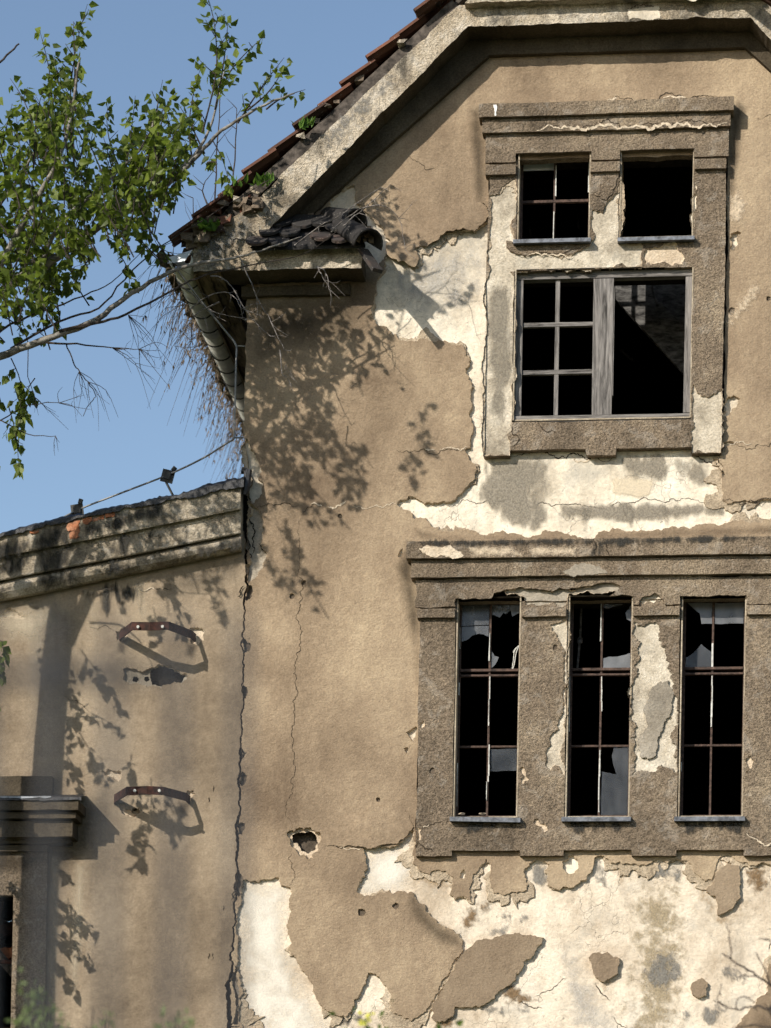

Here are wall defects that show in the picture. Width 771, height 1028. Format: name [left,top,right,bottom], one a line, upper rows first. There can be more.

flaking render [328,179,771,539]
damp [0,529,71,584]
damp [85,504,162,614]
peeling [419,545,464,559]
crack [238,482,397,828]
flaking render [627,622,680,776]
flaking render [240,827,771,1028]